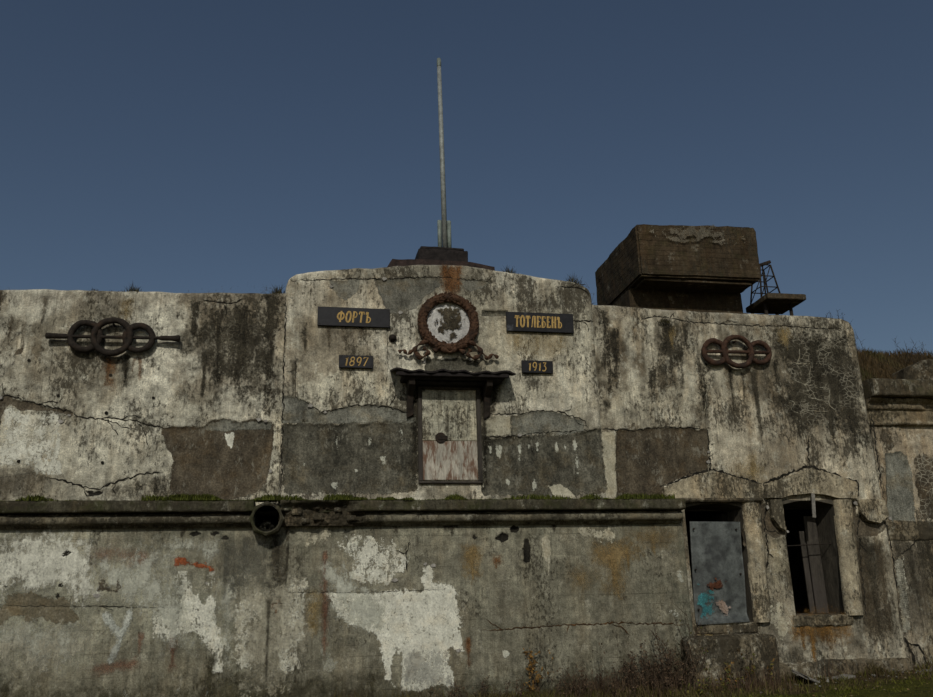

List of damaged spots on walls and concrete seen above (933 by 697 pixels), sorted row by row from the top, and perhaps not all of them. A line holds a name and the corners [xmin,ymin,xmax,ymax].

crack [0,471,162,496]
crack [2,384,171,445]
leakage [176,287,296,414]
spalling [161,395,418,500]
spalling [495,525,531,563]
leakage [695,361,714,409]
crack [484,374,926,664]
crack [631,311,845,414]
leakage [729,322,874,453]
peeling [0,529,313,681]
peeling [302,527,465,692]